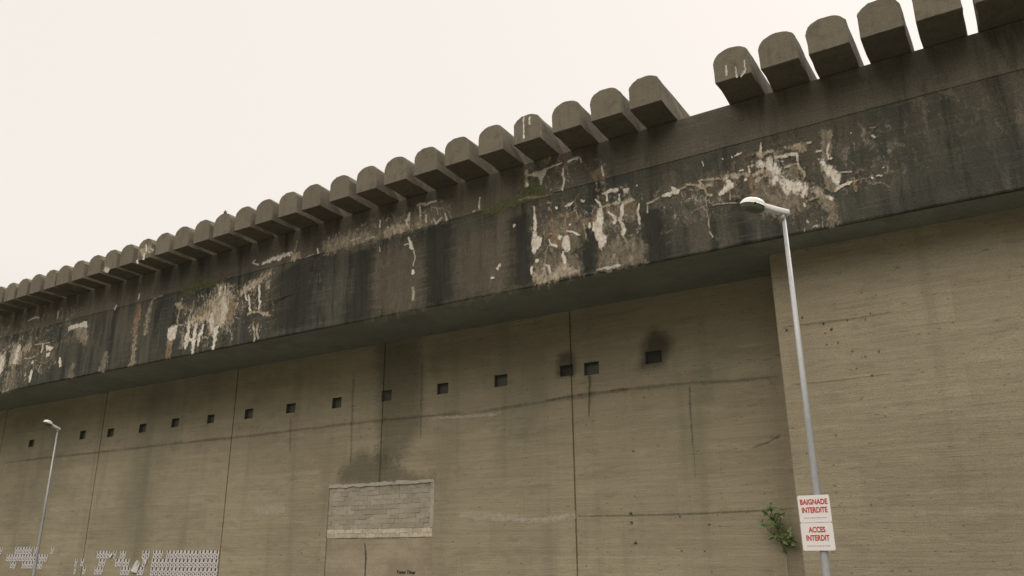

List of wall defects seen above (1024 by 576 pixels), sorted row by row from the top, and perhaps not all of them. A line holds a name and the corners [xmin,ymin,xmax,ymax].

spalling [524,156,562,188]
water stain [700,130,852,227]
spalling [326,200,449,253]
water stain [425,221,453,303]
spalling [530,250,580,286]
spalling [68,321,88,345]
spalling [165,283,240,359]